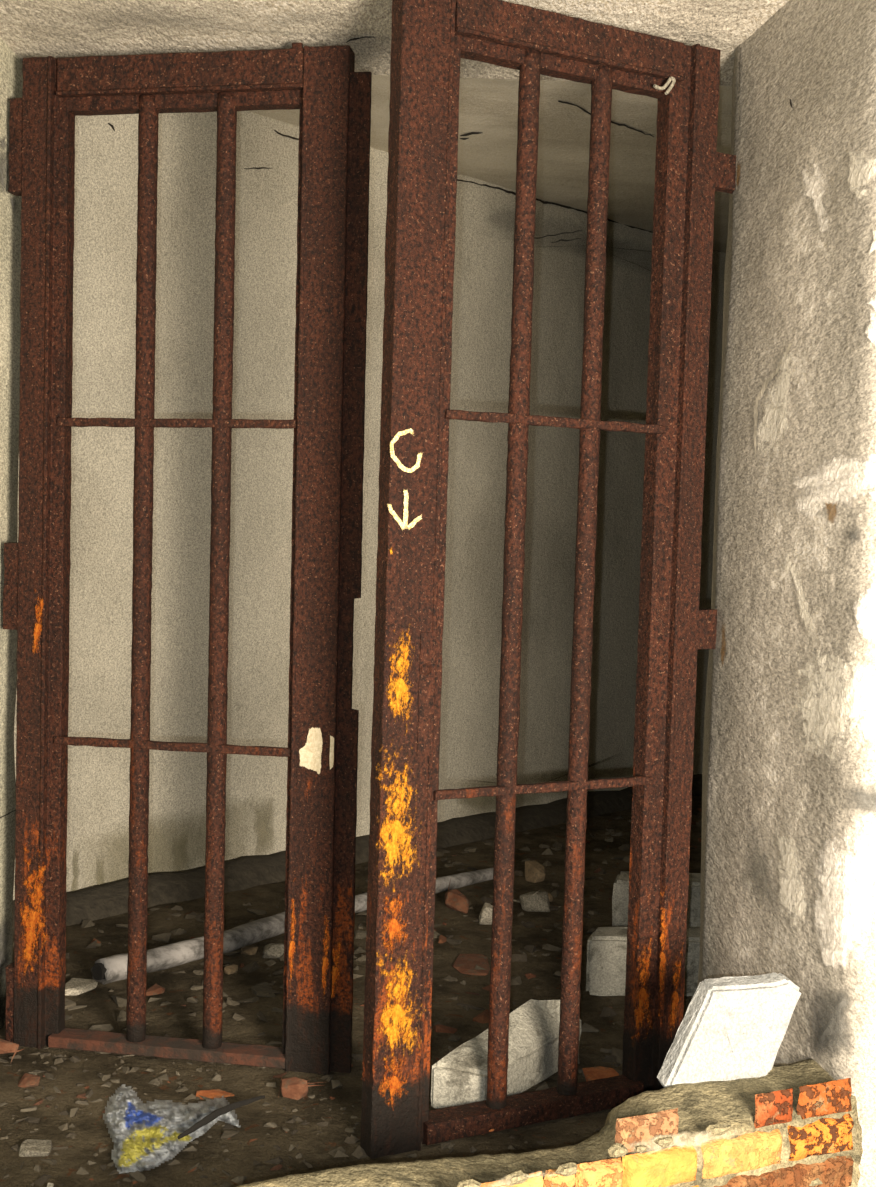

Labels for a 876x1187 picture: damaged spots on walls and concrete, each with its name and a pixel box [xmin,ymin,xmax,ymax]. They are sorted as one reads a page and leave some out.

rust [20,847,48,975]
rust [377,751,426,1105]
flaking render [457,1162,577,1187]
flaking render [608,1123,731,1157]